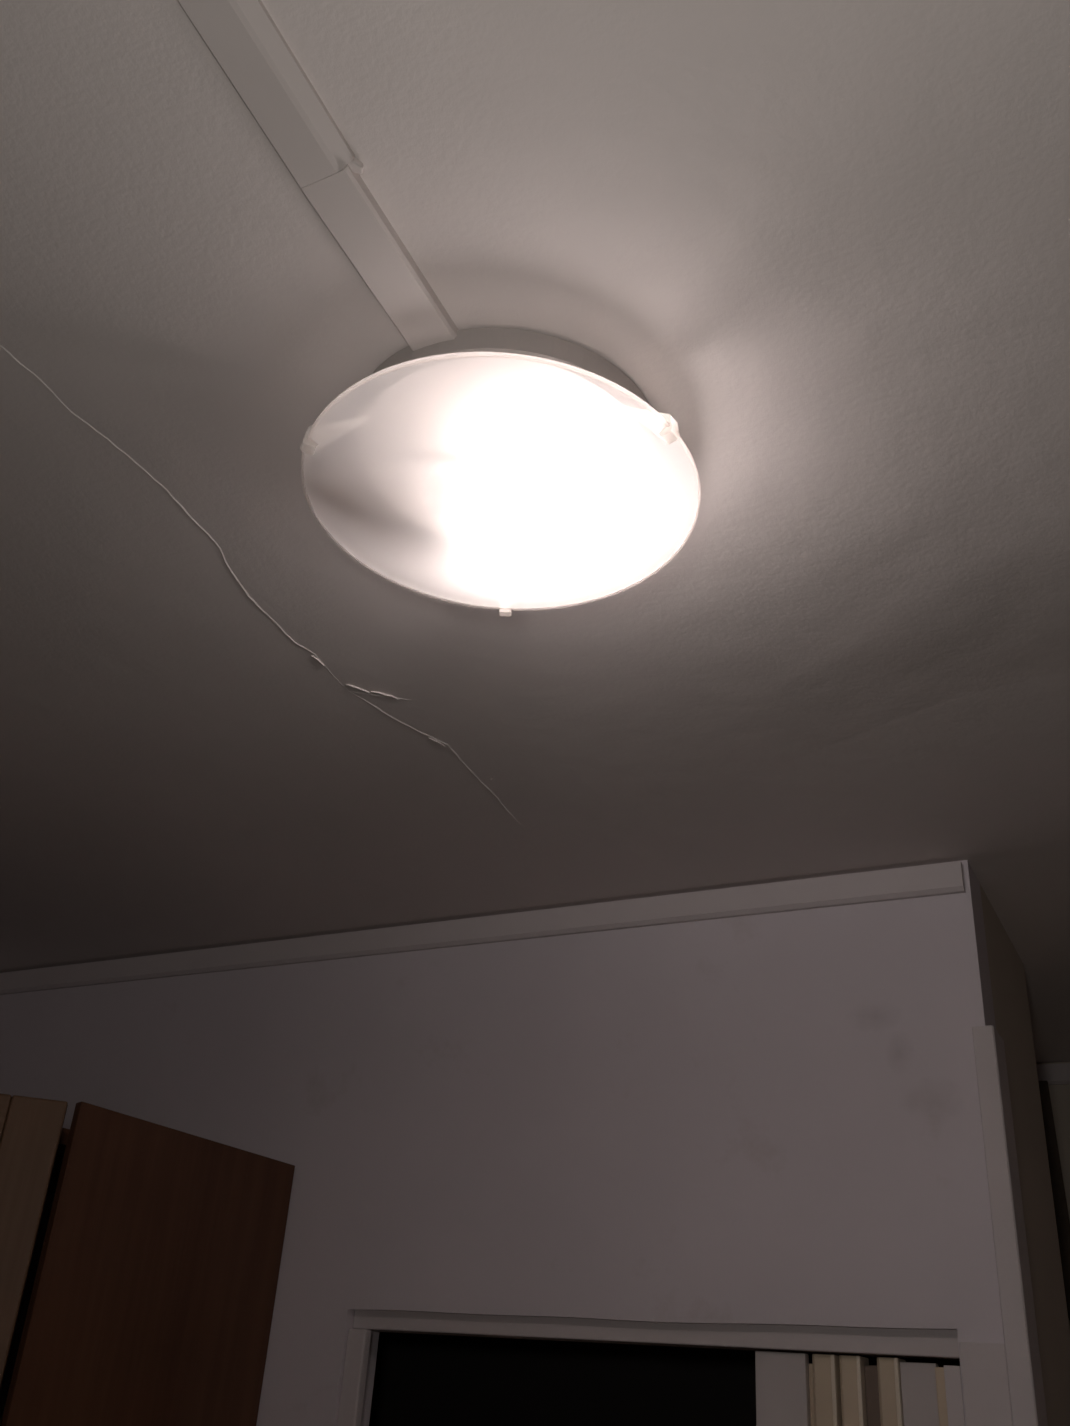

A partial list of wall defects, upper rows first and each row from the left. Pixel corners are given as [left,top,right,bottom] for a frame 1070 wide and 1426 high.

crack [0,345,521,825]